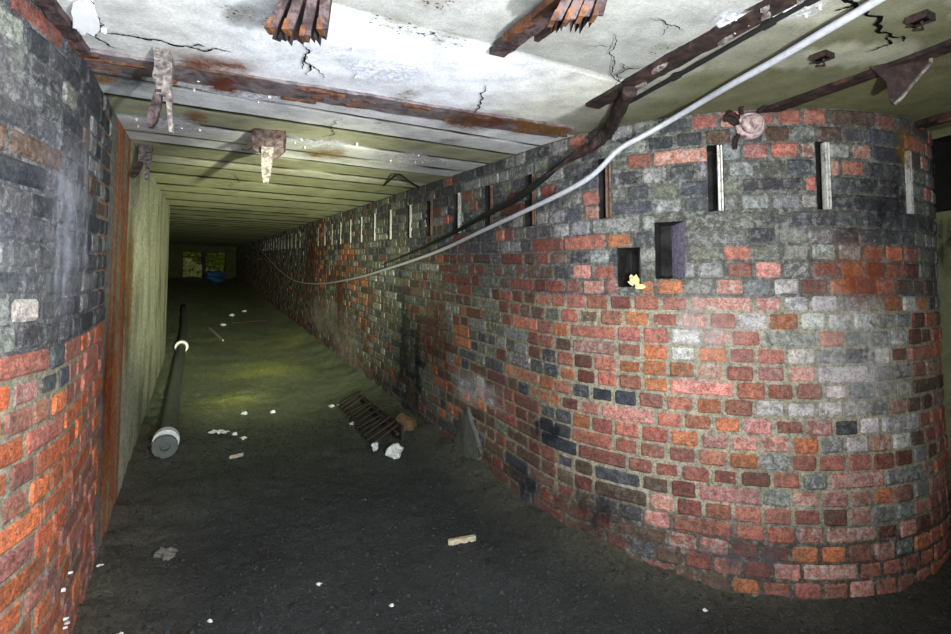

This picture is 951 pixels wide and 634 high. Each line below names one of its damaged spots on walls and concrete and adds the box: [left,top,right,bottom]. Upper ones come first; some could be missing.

peeling [71,0,107,37]
crack [834,0,906,52]
crack [302,45,325,78]
crack [591,34,642,86]
corrosion [281,87,376,109]
corrosion [444,114,567,137]